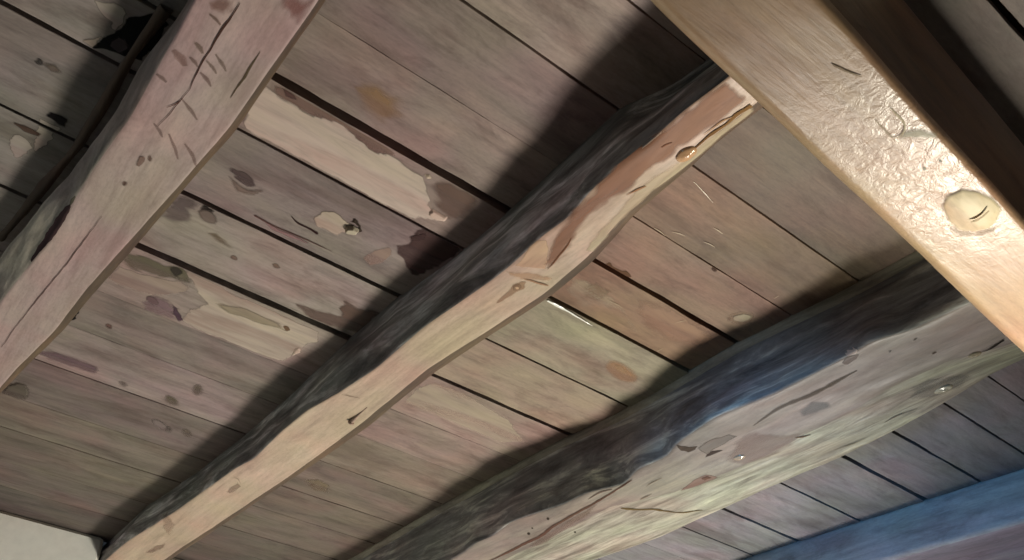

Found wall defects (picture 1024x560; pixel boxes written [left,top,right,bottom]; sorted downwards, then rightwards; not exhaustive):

spalling [84,1,169,61]
crack [158,3,240,126]
crack [230,53,260,98]
water stain [231,169,262,195]
peeling [244,87,447,221]
water stain [547,85,745,264]
peeling [291,212,362,235]
water stain [125,254,190,282]
water stain [398,229,460,275]
peeling [111,267,318,361]
water stain [297,302,379,332]
water stain [642,304,708,342]